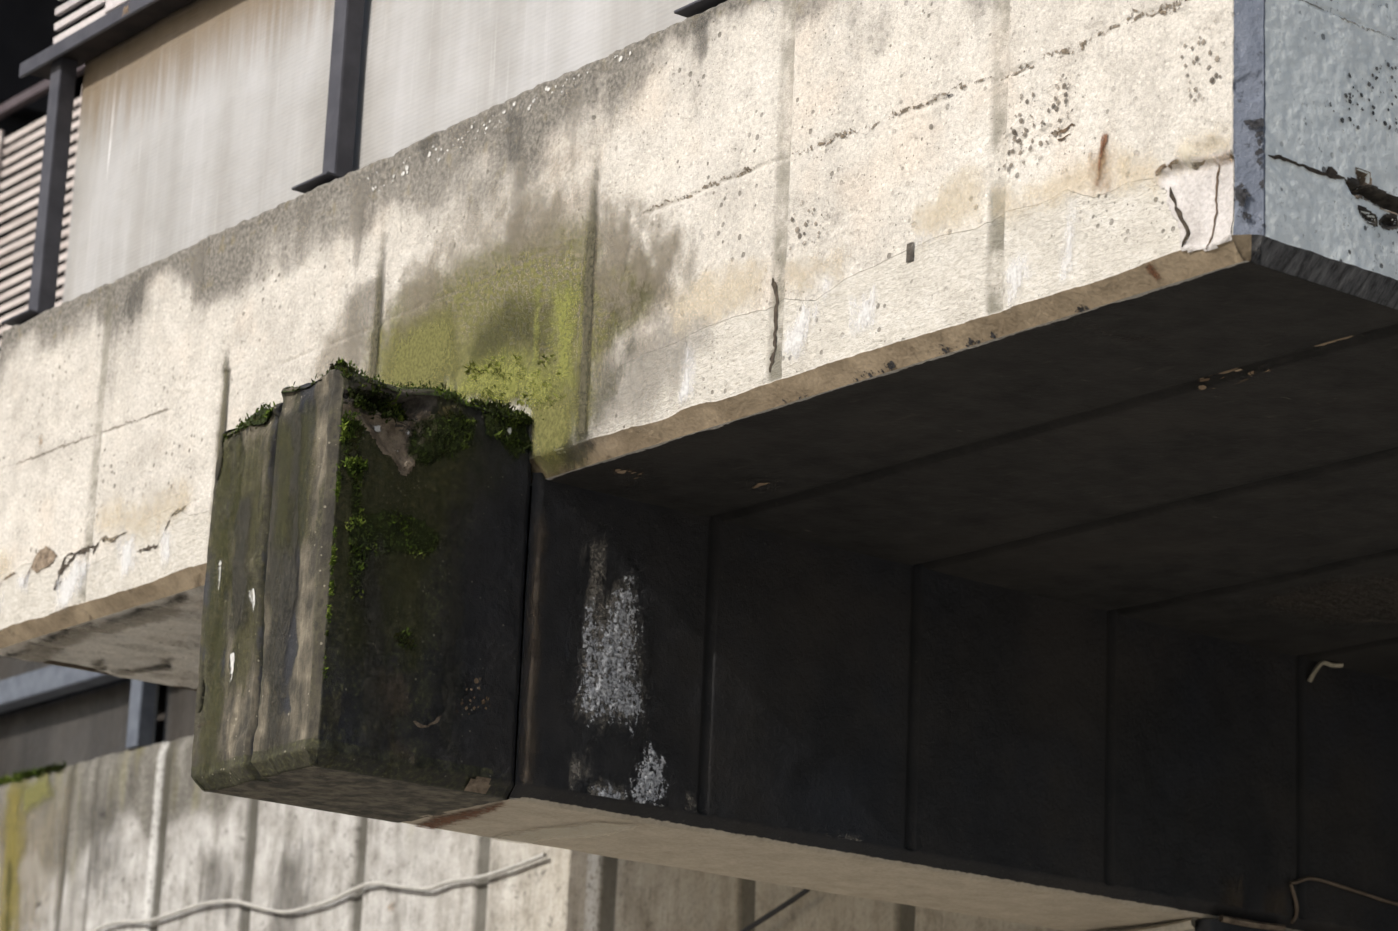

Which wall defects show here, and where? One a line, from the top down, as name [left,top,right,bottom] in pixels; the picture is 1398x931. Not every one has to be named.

crack [636,166,752,217]
corrosion [1096,134,1108,185]
leakage [369,248,383,380]
leakage [560,170,596,470]
crack [769,278,779,372]
spalling [342,381,437,476]
spalling [32,545,57,573]
leakage [574,540,645,733]
leakage [570,759,588,789]
leakage [630,743,668,806]